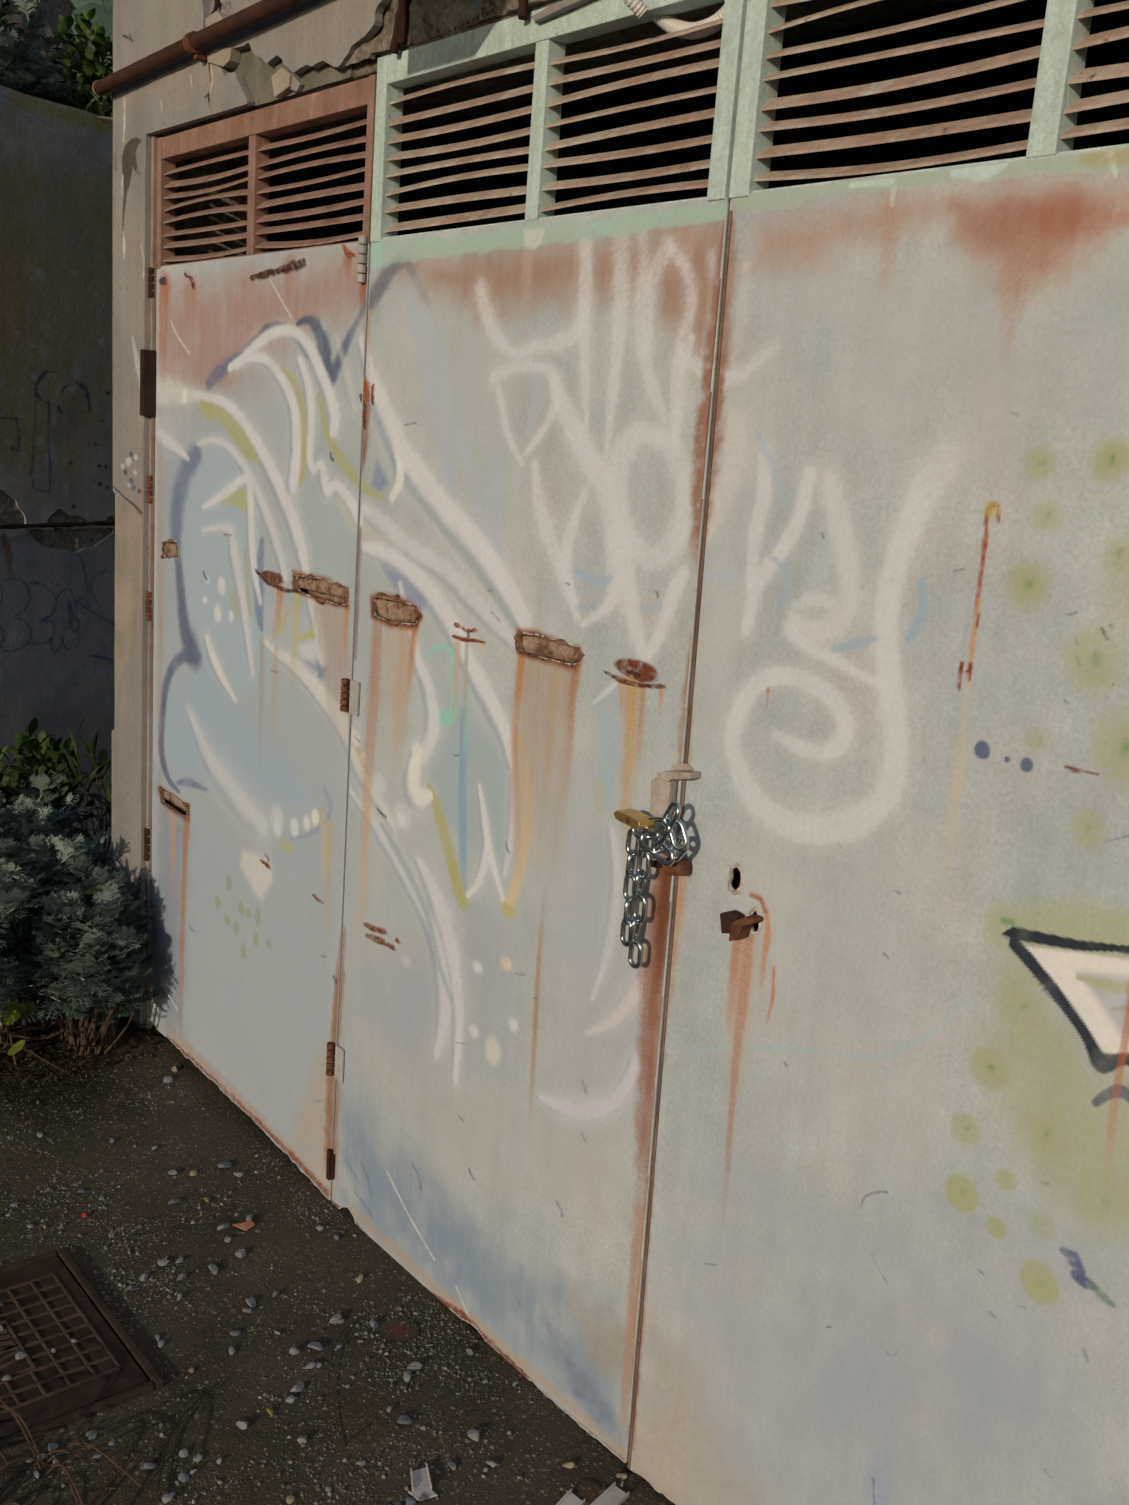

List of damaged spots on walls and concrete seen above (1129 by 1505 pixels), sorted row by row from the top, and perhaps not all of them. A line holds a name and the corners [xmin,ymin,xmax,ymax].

spalling [205,0,592,107]
rust [391,244,571,343]
rust [685,172,1129,567]
peeling [0,450,141,729]
rust [155,435,426,1245]
rust [933,497,1004,924]
rust [425,621,699,1462]
rust [719,889,777,1238]
rust [1100,958,1129,1194]